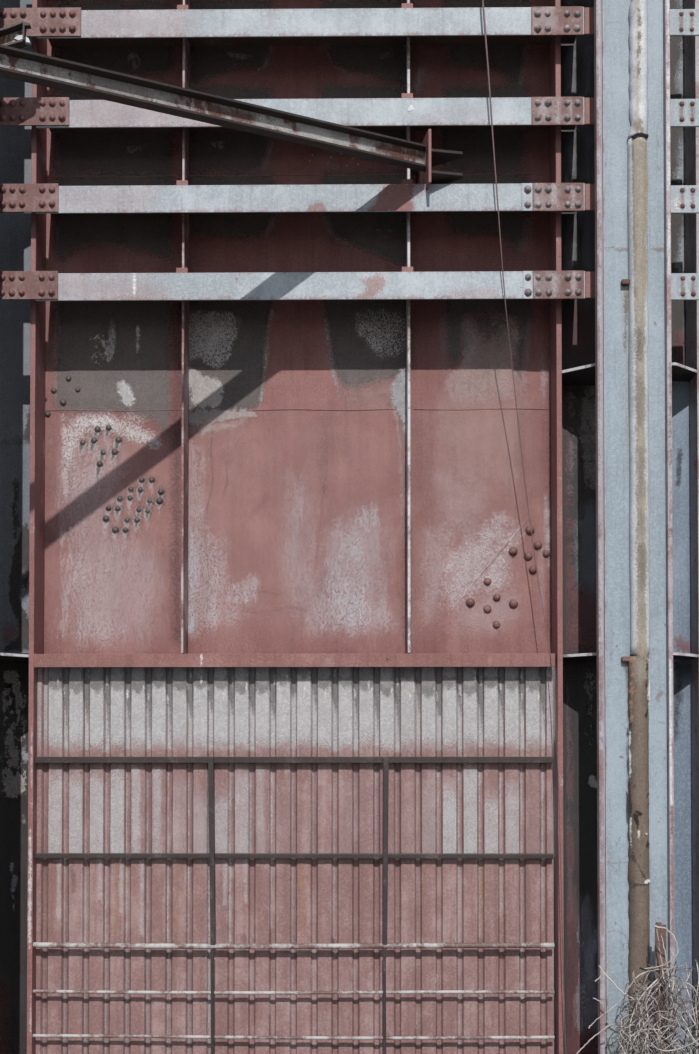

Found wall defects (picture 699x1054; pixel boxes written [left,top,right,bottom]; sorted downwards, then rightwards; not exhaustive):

corrosion [370,184,416,211]
corrosion [361,274,385,299]
peeling [189,300,272,419]
peeling [1,667,553,798]